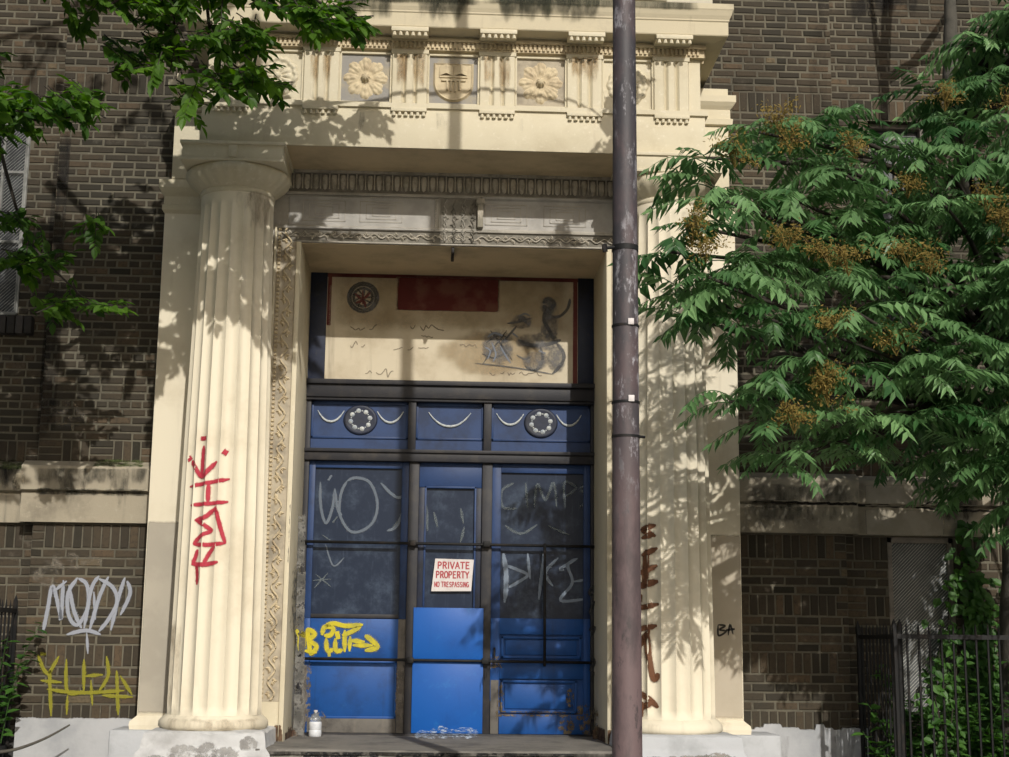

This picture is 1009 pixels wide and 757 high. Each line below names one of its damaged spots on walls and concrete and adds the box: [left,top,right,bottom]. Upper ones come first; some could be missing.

leakage [421,0,465,16]
leakage [500,0,598,15]
leakage [38,468,145,496]
spalling [274,515,327,742]
peeling [151,736,257,757]